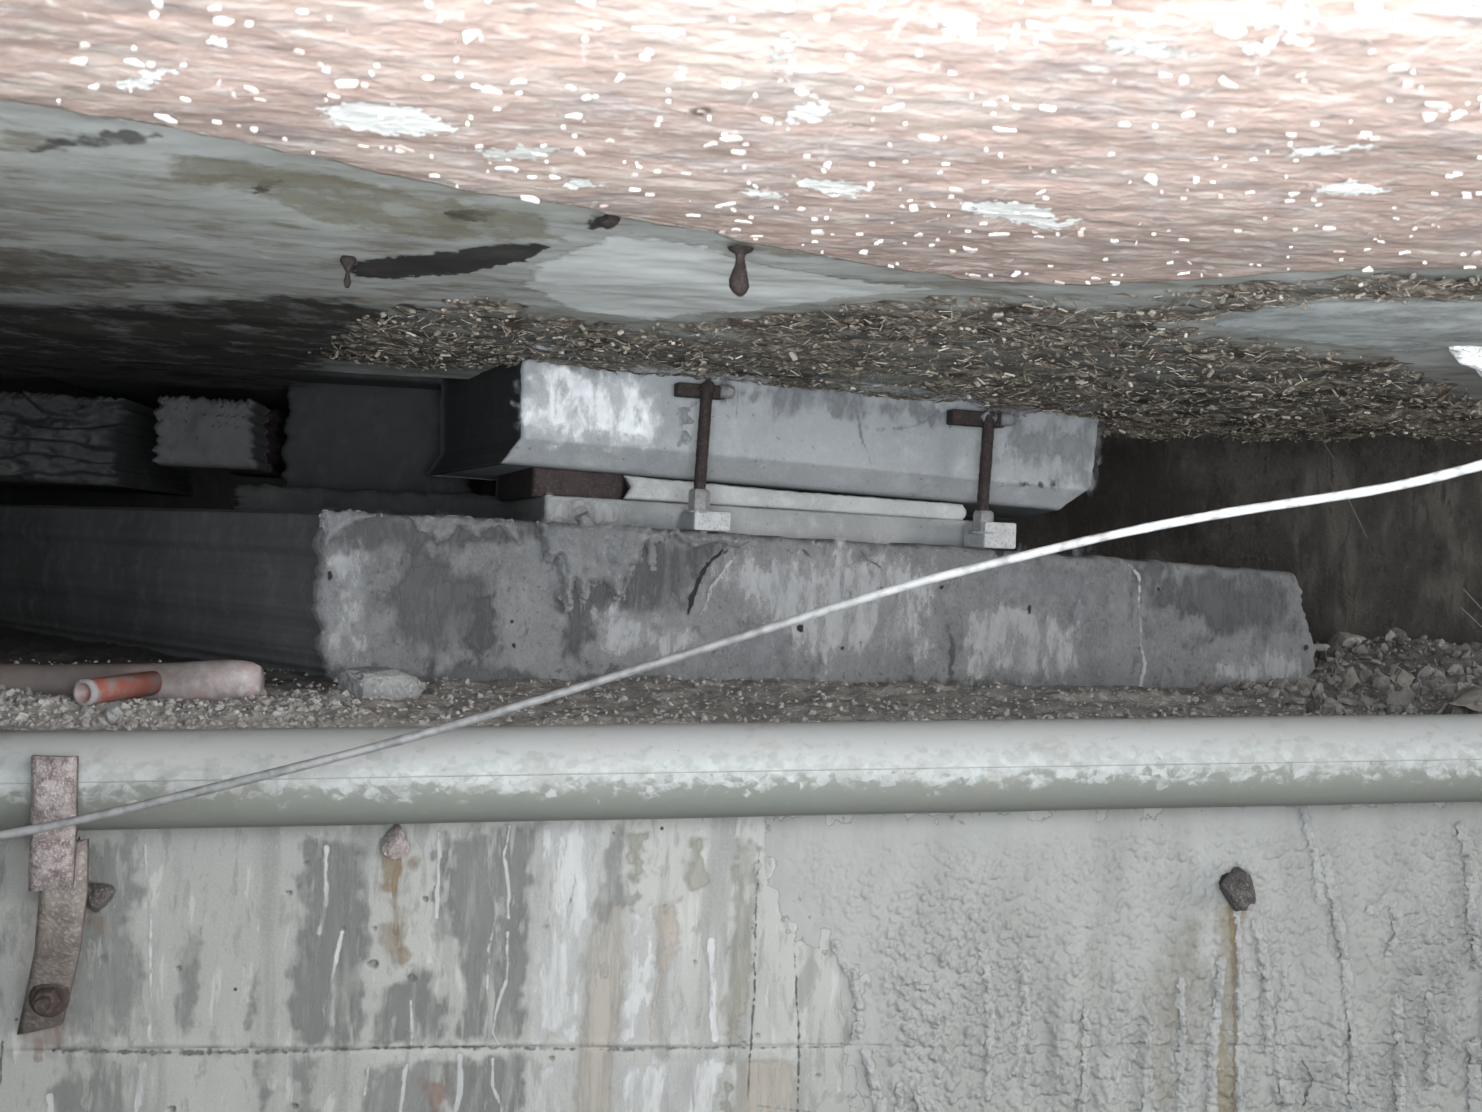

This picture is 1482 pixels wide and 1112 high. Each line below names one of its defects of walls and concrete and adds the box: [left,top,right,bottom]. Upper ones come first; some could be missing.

peeling [207,5,253,48]
peeling [762,32,854,131]
peeling [110,114,337,161]
peeling [294,49,609,230]
peeling [629,110,913,270]
peeling [891,162,1086,254]
peeling [1285,120,1440,272]
peeling [1431,172,1482,199]
damp [523,236,937,321]
peeling [1086,223,1222,286]
crack [688,549,735,615]
corrosion [1217,907,1241,1112]